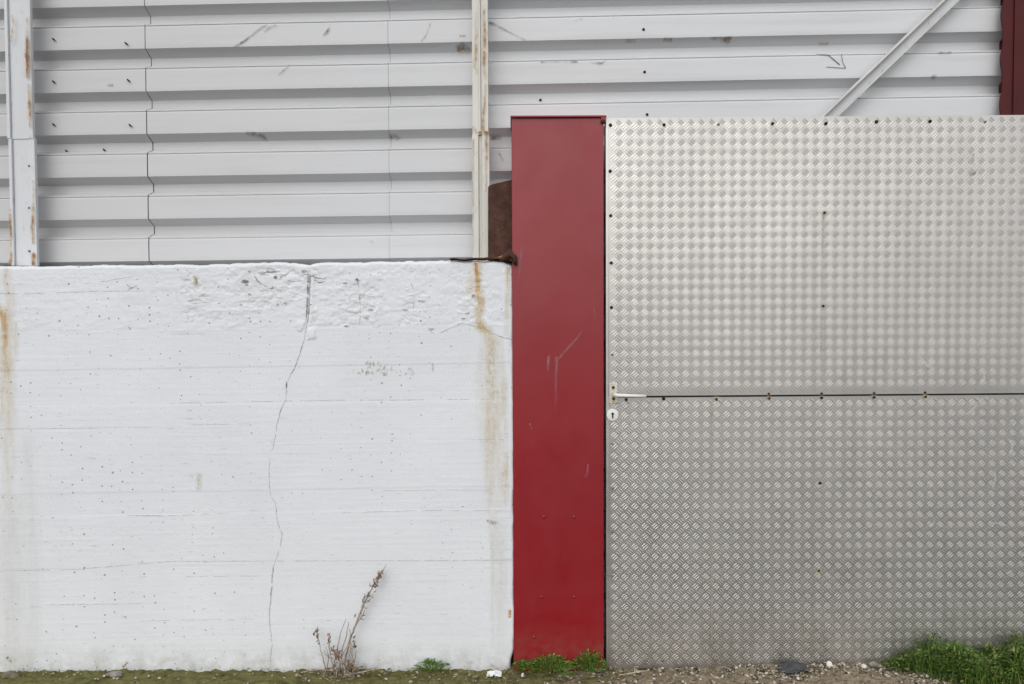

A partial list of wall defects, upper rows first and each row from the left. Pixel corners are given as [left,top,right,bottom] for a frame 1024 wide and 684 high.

corrosion [474,263,486,332]
corrosion [0,311,8,358]
crack [255,274,326,668]